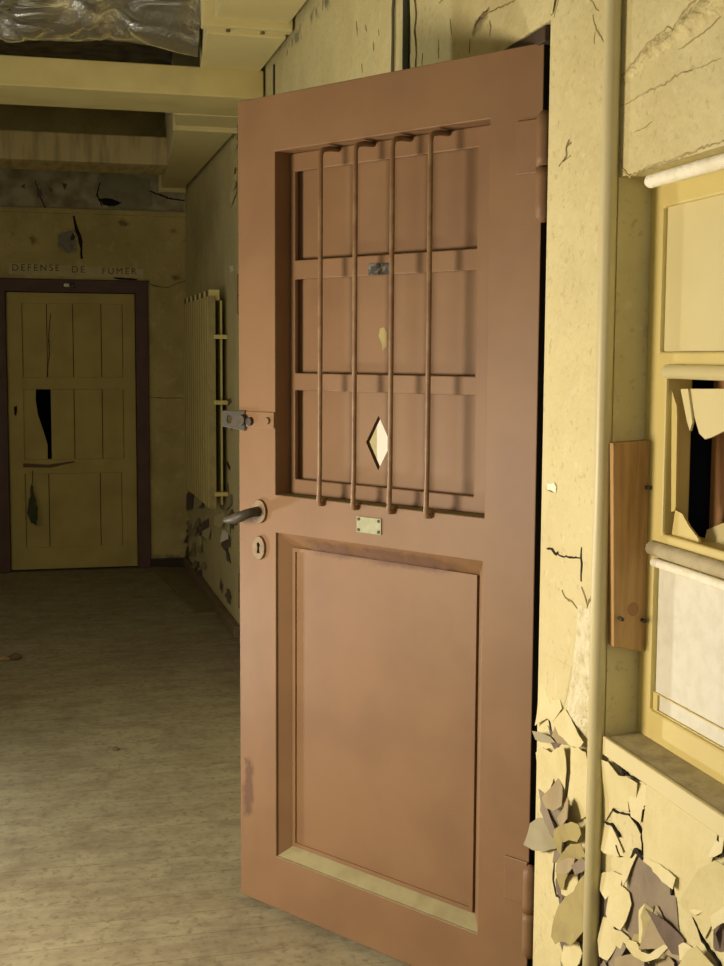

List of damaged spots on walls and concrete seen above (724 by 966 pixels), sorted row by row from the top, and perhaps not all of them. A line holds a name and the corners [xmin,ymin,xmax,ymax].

crack [421,0,515,62]
crack [589,0,604,44]
crack [620,0,721,107]
peeling [230,133,238,208]
crack [71,215,83,259]
peeling [183,486,237,576]
crack [547,547,591,609]
peeling [523,683,588,966]
peeling [597,759,724,966]